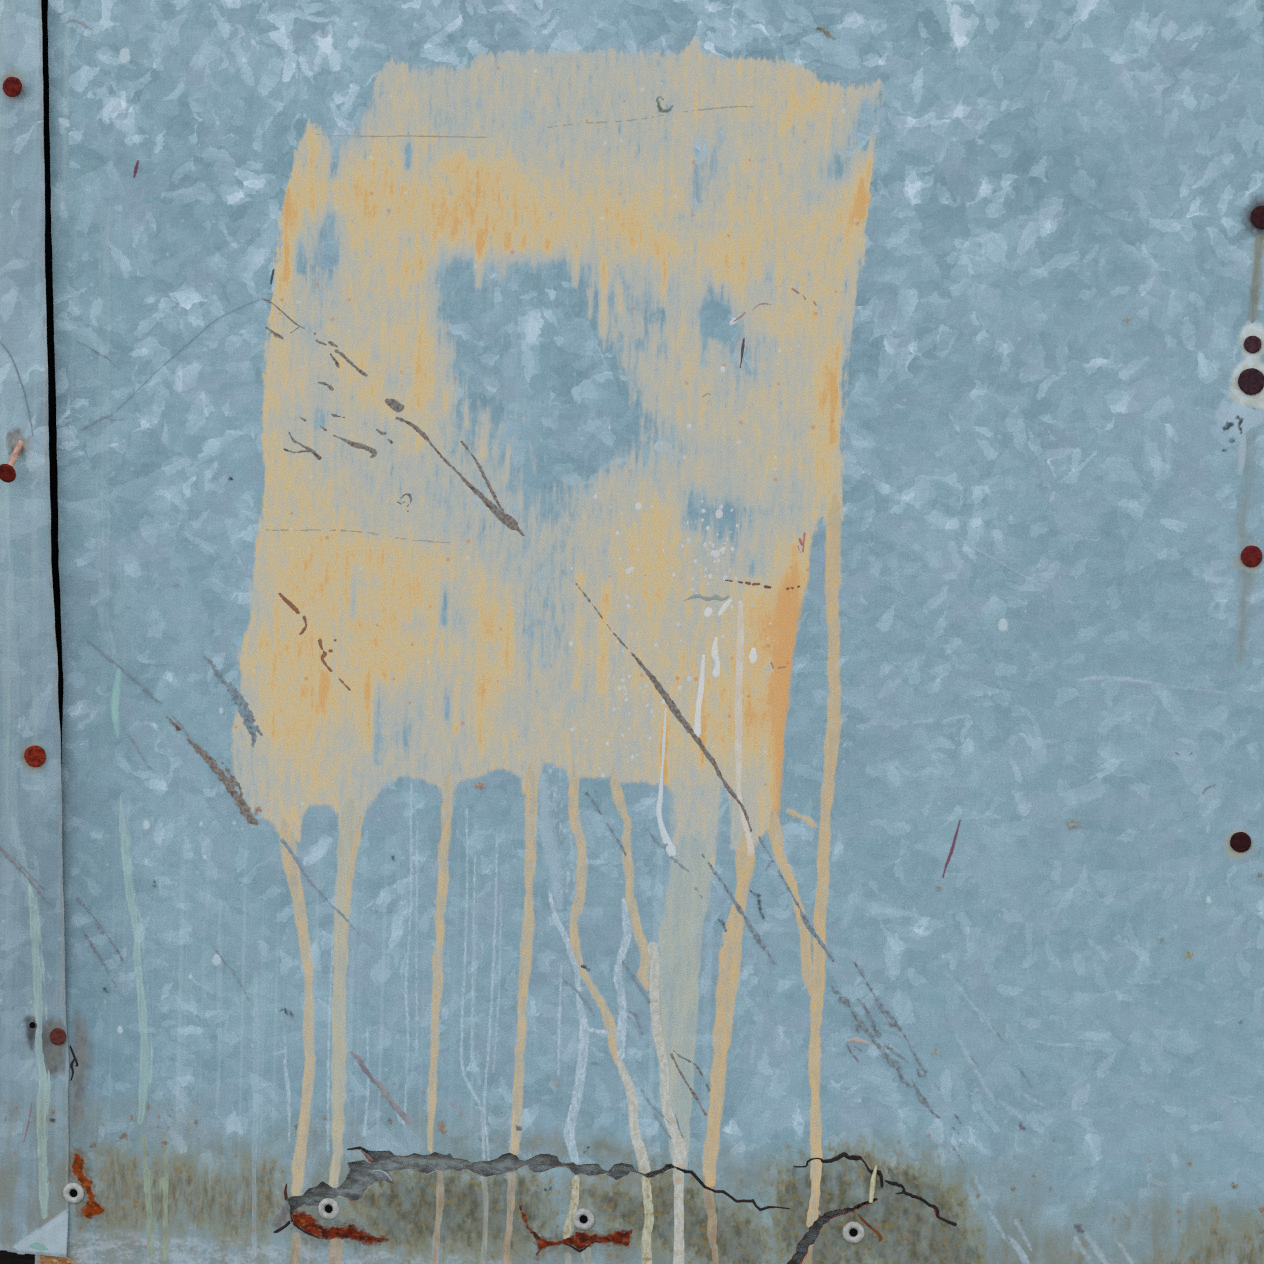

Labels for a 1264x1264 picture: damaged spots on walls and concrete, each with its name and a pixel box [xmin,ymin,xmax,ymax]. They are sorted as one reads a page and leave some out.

leakage [66,1003,309,1258]
corrosion [35,1253,135,1264]
corrosion [69,1136,106,1234]
corrosion [271,1202,390,1257]
corrosion [518,1202,633,1264]
crack [273,1145,962,1264]
leakage [334,1112,1264,1264]